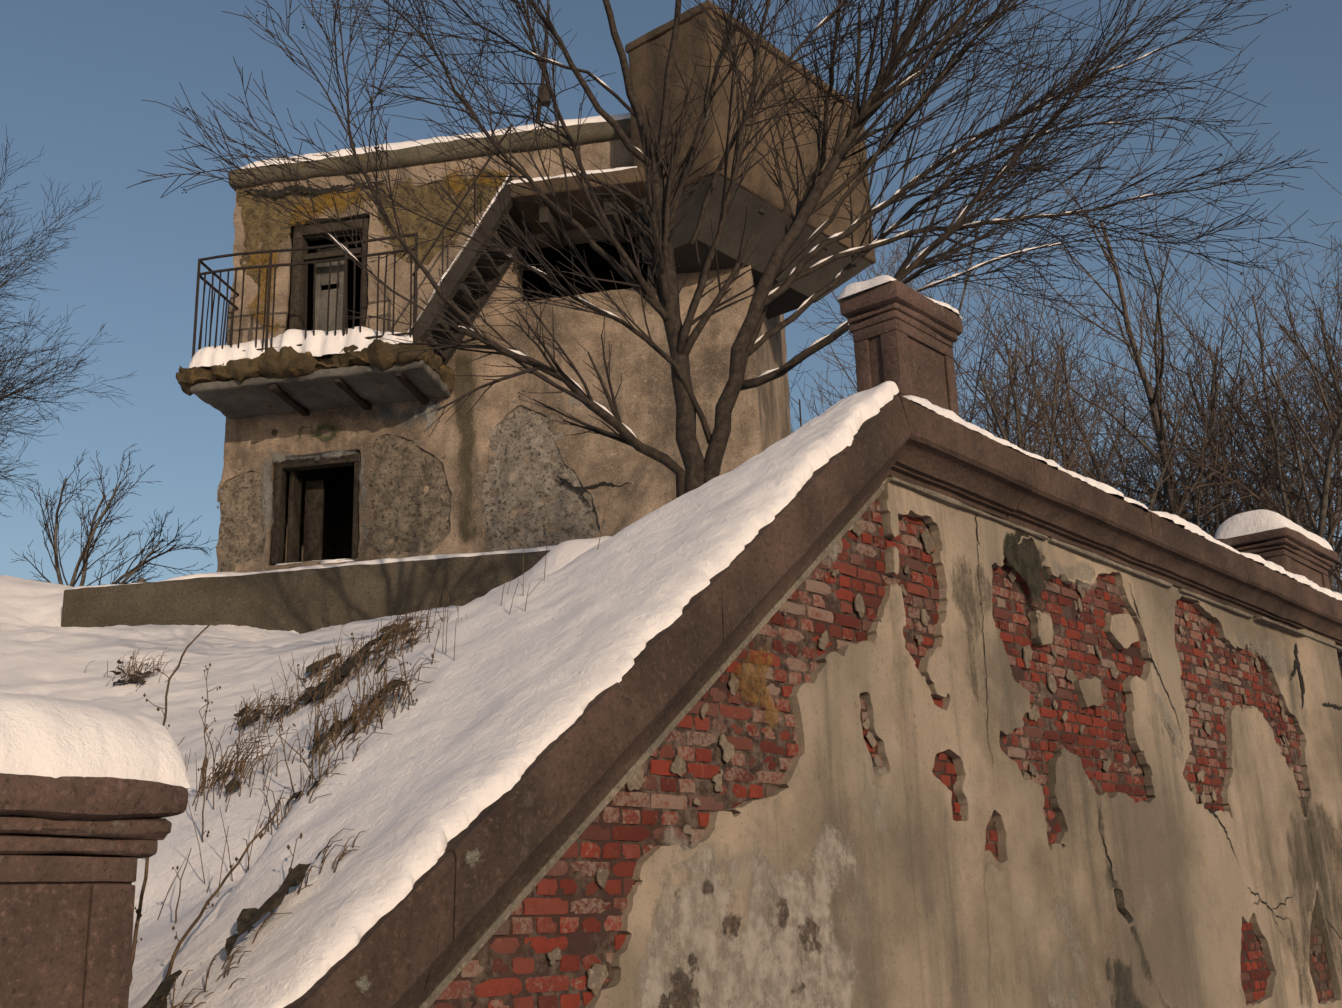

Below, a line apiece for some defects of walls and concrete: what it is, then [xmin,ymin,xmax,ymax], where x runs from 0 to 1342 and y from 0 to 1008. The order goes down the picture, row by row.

spalling [361,434,452,559]
spalling [474,399,608,552]
crack [556,476,627,506]
flaking render [429,495,940,1008]
flaking render [932,752,962,821]
flaking render [985,816,999,861]
flaking render [992,548,1149,844]
crack [1097,803,1118,888]
flaking render [1174,599,1306,812]
crack [1204,644,1342,937]
flaking render [1240,922,1271,1004]
flaking render [1309,909,1334,1003]